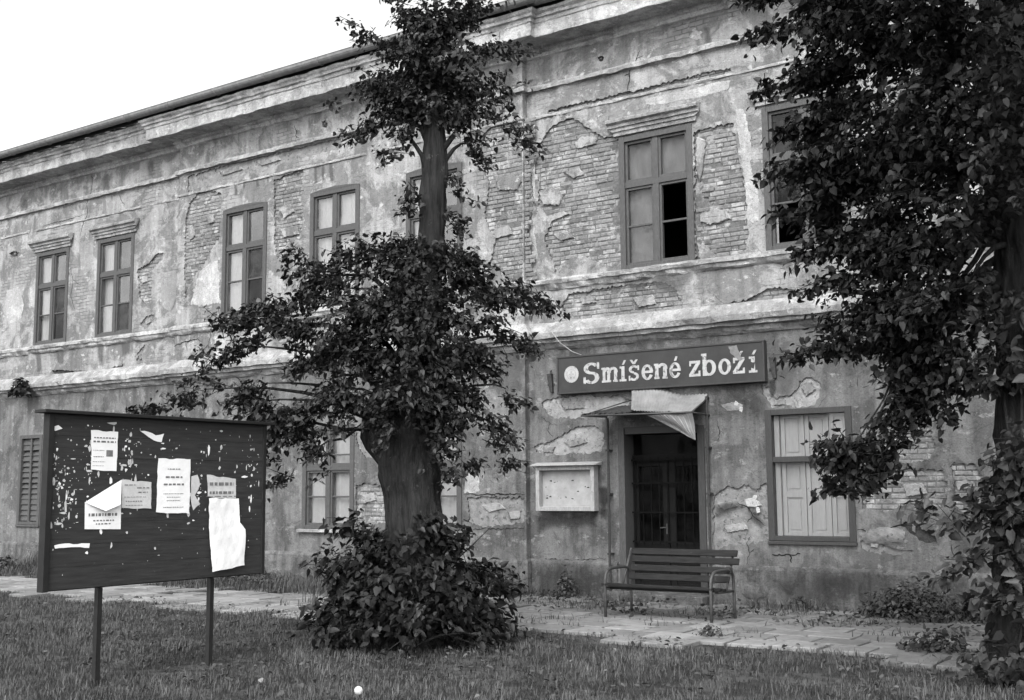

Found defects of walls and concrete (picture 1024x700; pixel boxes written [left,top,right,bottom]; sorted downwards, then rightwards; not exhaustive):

spalling [481,68,732,282]
spalling [694,107,759,260]
spalling [185,139,342,306]
spalling [138,253,163,303]
spalling [561,281,682,319]
spalling [732,287,803,303]
peeling [762,377,821,408]
spalling [535,394,630,456]
spalling [464,474,528,527]
spalling [860,417,983,555]